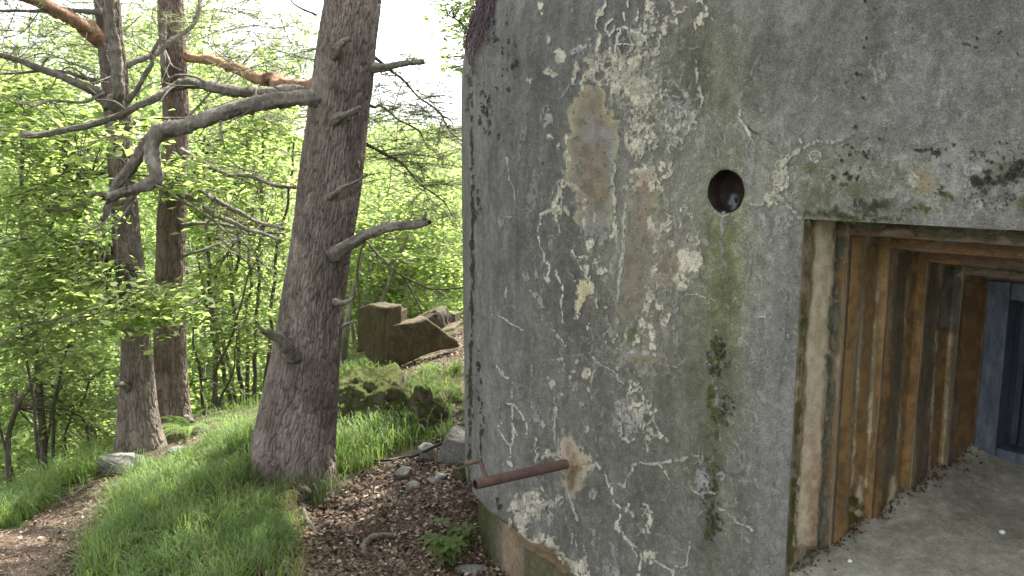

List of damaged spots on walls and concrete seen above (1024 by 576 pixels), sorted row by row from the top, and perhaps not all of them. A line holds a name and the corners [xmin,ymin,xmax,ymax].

leakage [539,105,560,148]
peeling [526,35,717,452]
leakage [752,163,1024,242]
leakage [522,269,545,309]
rust [538,436,595,522]
leakage [688,211,735,576]
leakage [782,293,829,576]
peeling [495,487,591,576]